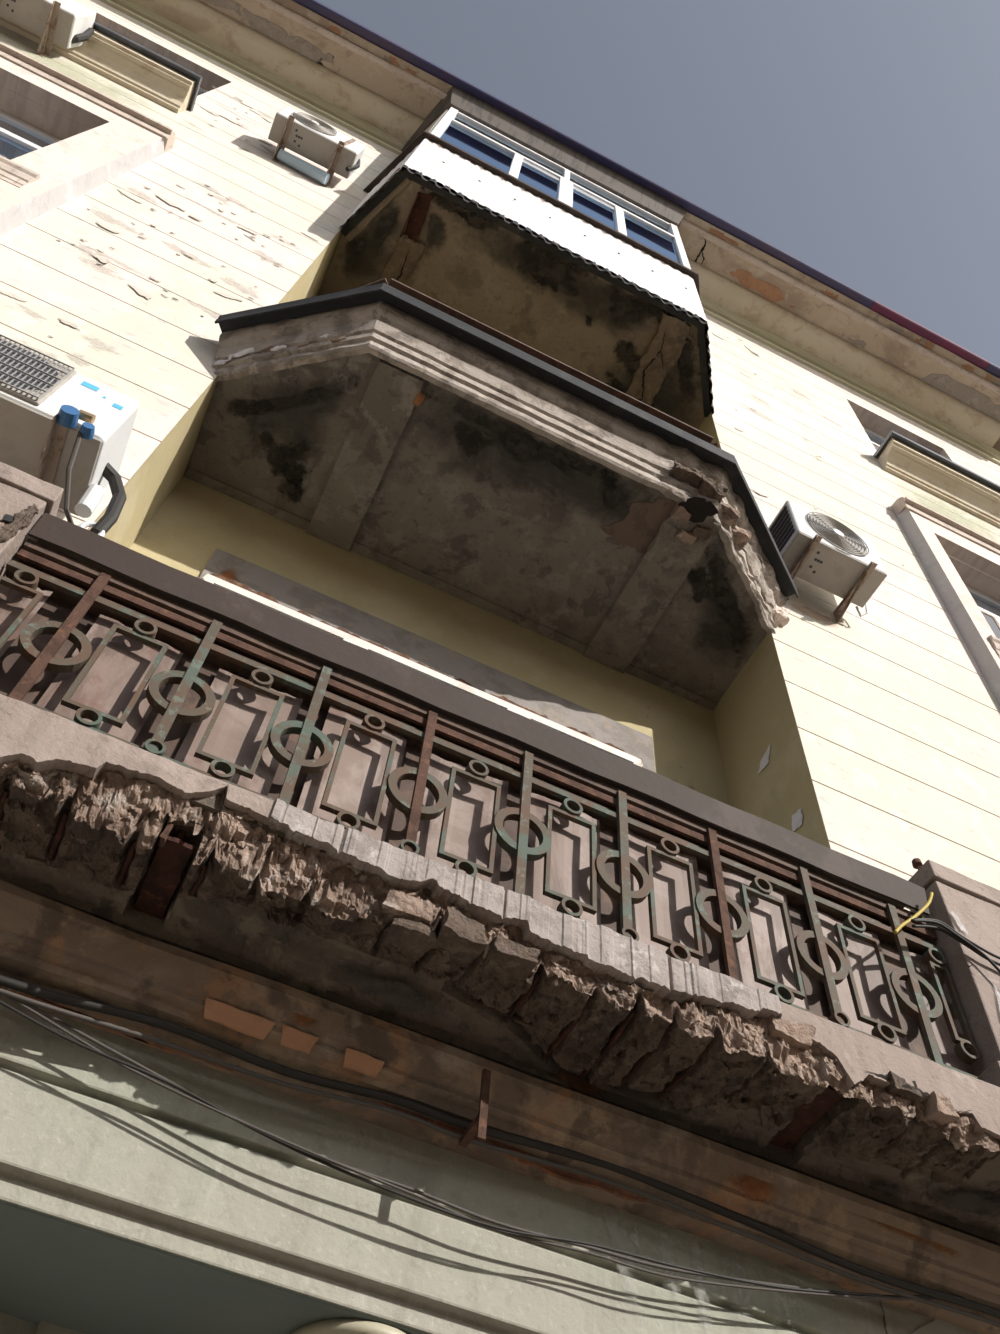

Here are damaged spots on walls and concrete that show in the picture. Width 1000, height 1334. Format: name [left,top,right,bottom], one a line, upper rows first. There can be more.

flaking render [0,986,240,1072]
flaking render [379,1101,647,1203]